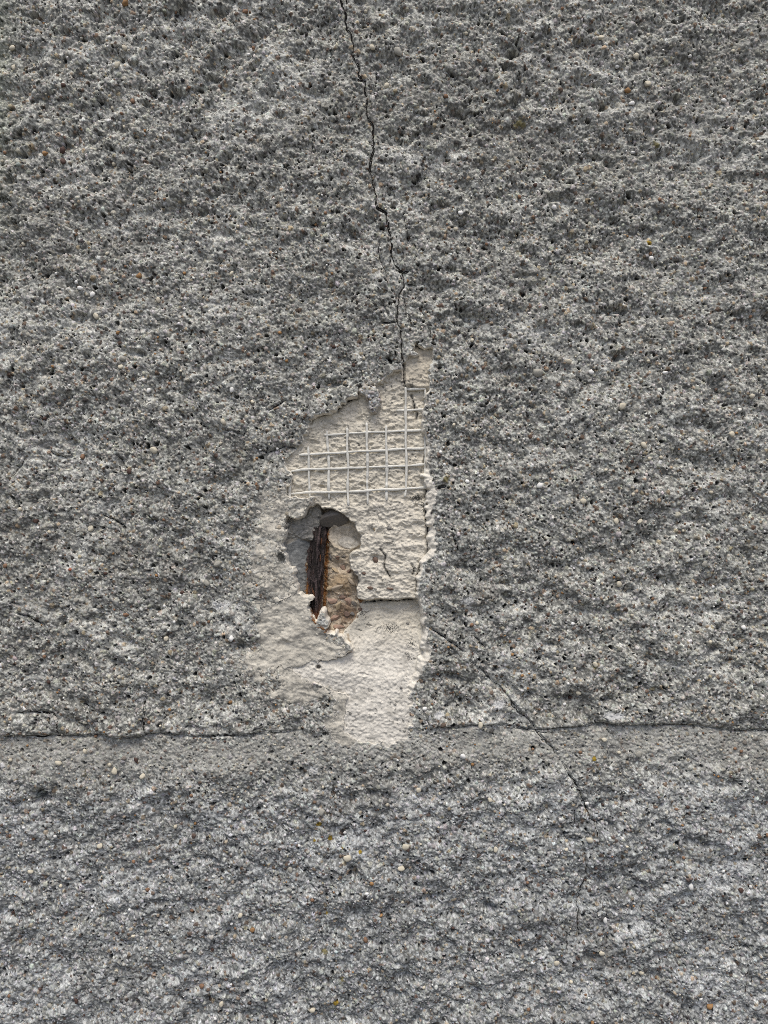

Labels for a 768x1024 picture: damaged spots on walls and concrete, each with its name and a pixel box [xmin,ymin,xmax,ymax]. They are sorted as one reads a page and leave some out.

crack [340,0,431,415]
crack [5,710,89,737]
flaking render [229,343,438,748]
corrosion [305,525,363,633]
crack [427,626,615,945]